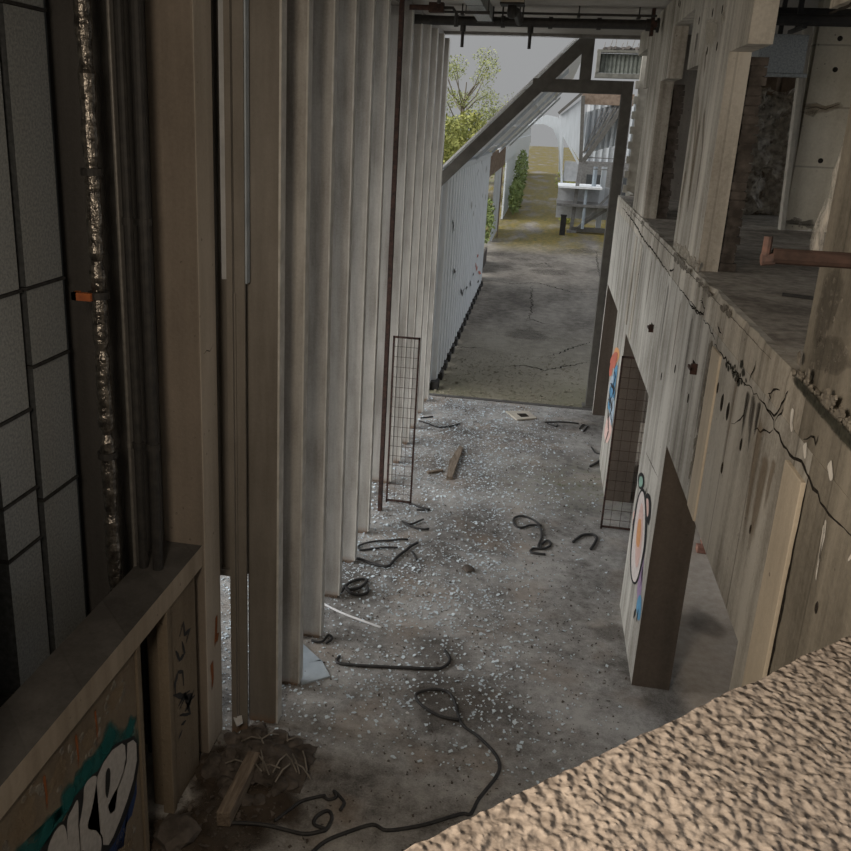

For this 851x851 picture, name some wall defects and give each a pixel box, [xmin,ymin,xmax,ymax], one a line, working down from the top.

crack [623,208,851,676]
spalling [791,351,851,450]